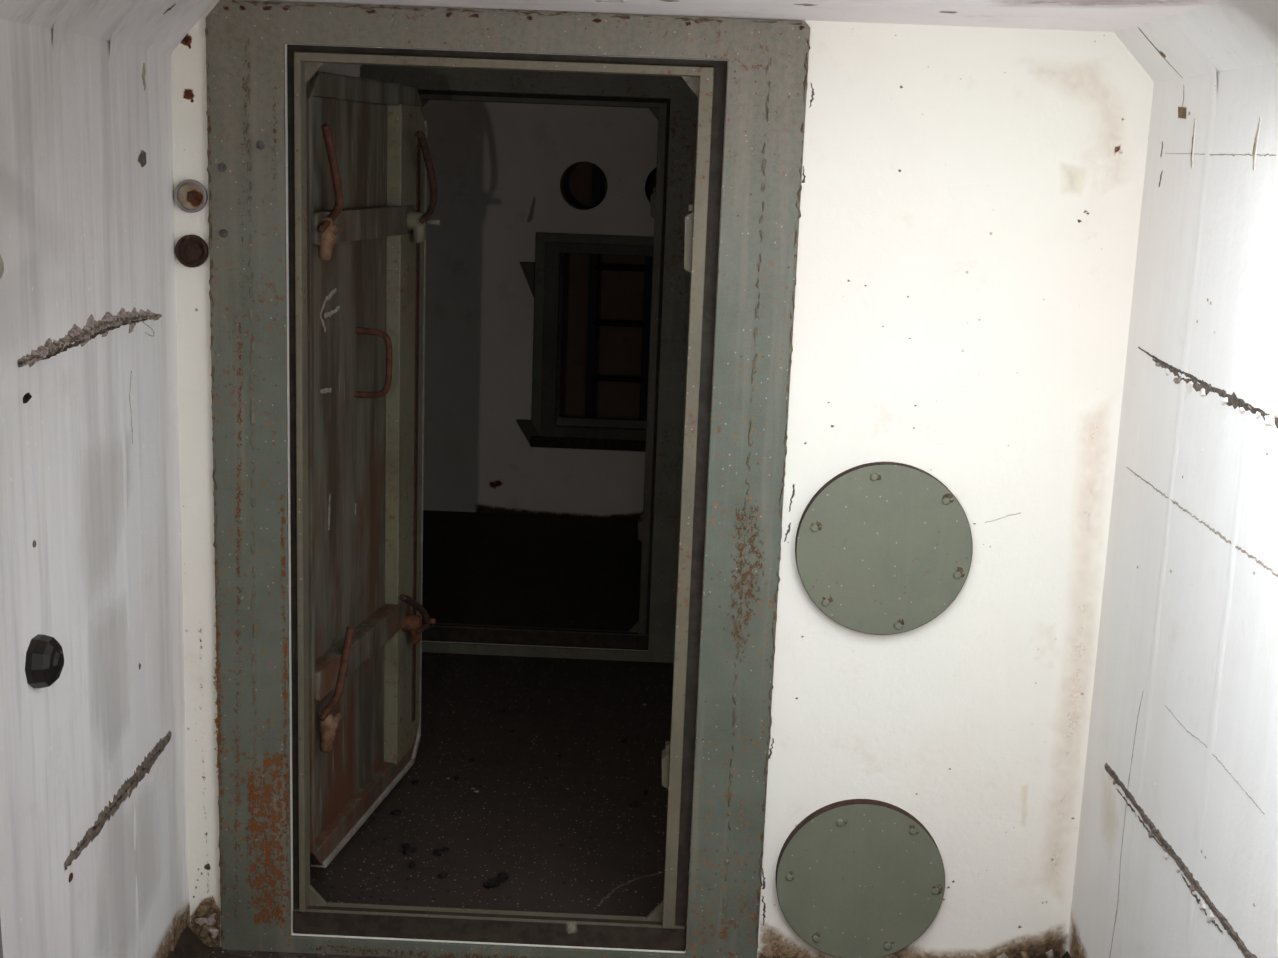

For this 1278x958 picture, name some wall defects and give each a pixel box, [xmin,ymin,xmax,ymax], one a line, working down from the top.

rust [753,20,810,101]
rust [181,28,216,446]
crack [1138,347,1278,429]
rust [723,122,804,957]
rust [199,323,291,941]
crack [64,730,171,883]
crack [1105,693,1265,958]
damp [758,929,828,958]
damp [884,923,1086,958]